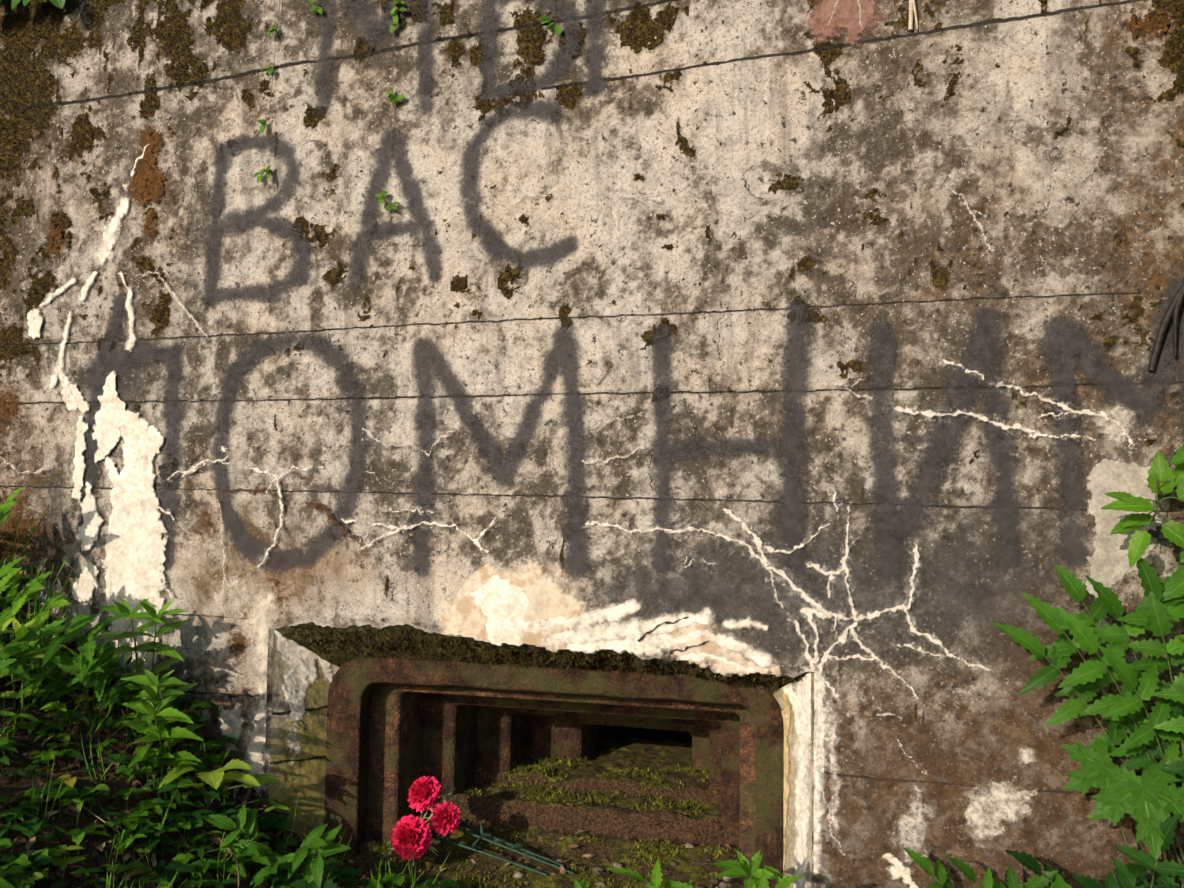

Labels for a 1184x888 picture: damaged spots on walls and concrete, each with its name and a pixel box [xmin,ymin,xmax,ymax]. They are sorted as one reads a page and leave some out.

rust [129,124,166,249]
crack [362,427,458,457]
crack [581,446,653,490]
crack [830,359,1133,444]
crack [167,446,498,616]
spalling [435,560,780,676]
crack [585,488,990,775]
crack [821,787,844,855]